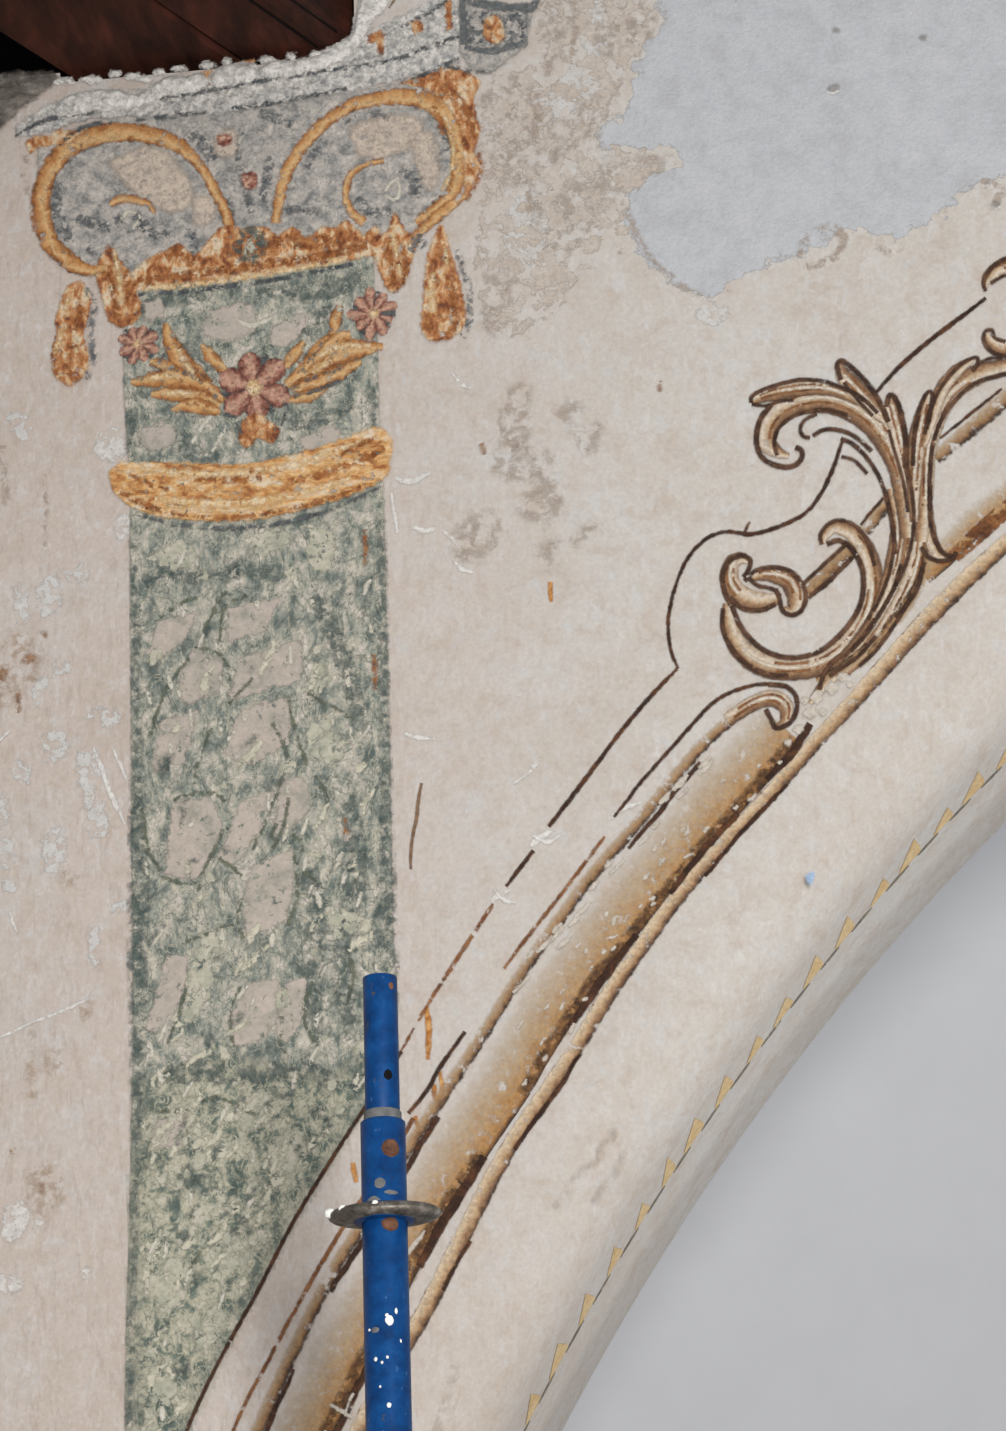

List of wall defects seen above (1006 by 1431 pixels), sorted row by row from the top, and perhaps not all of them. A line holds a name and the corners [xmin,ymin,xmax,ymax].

peeling [549,0,610,122]
peeling [593,0,1006,327]